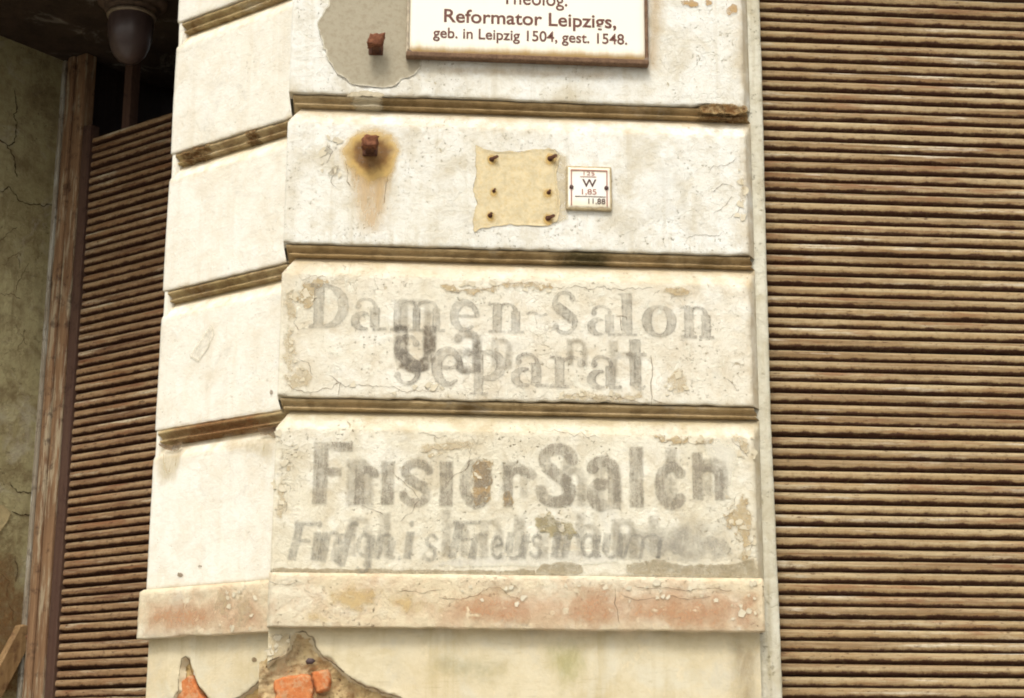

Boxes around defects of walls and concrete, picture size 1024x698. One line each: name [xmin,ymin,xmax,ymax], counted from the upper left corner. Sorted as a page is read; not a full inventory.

crack [0,90,51,207]
corrosion [342,132,399,226]
peeling [723,494,756,565]
peeling [583,579,731,625]
flaking render [174,656,208,698]
flaking render [238,631,401,698]